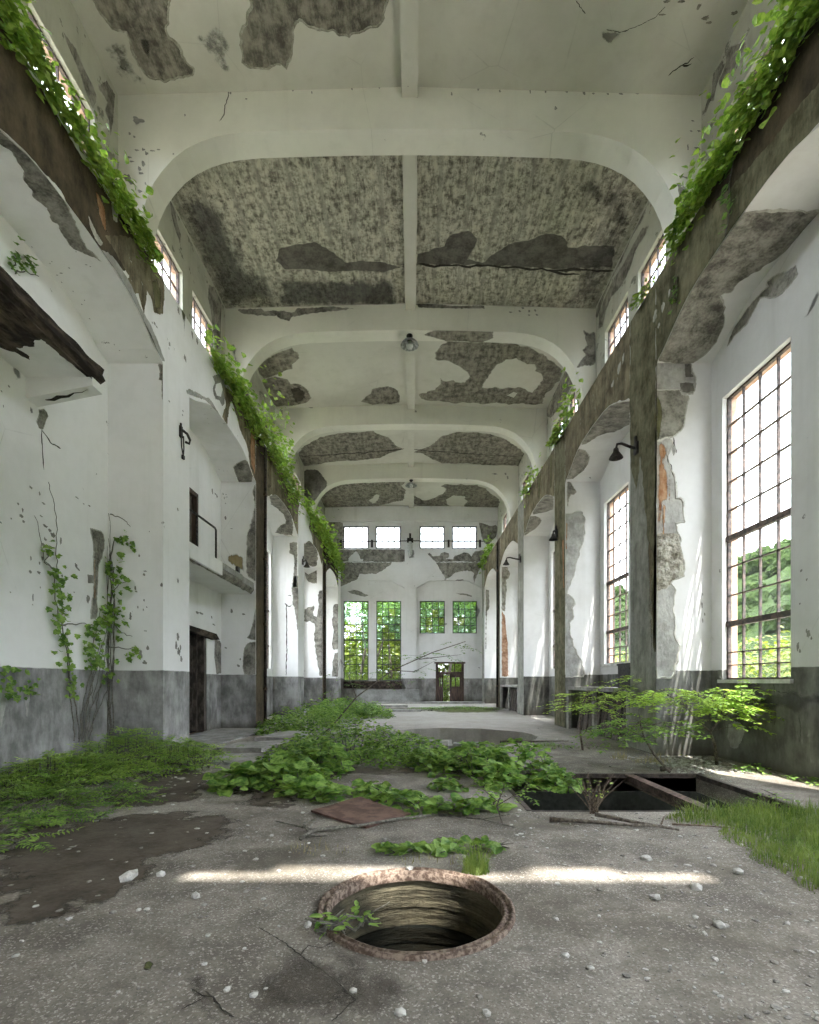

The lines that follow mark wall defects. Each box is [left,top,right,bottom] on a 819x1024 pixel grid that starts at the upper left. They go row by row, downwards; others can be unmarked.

flaking render [93,0,195,83]
flaking render [239,0,389,70]
flaking render [0,130,170,402]
flaking render [170,155,649,419]
crack [418,263,613,276]
crack [45,389,88,401]
flaking render [29,486,62,574]
crack [41,430,61,468]
spalling [74,528,105,619]
spalling [565,401,630,678]
rust [658,443,670,534]
flaking render [656,208,819,679]